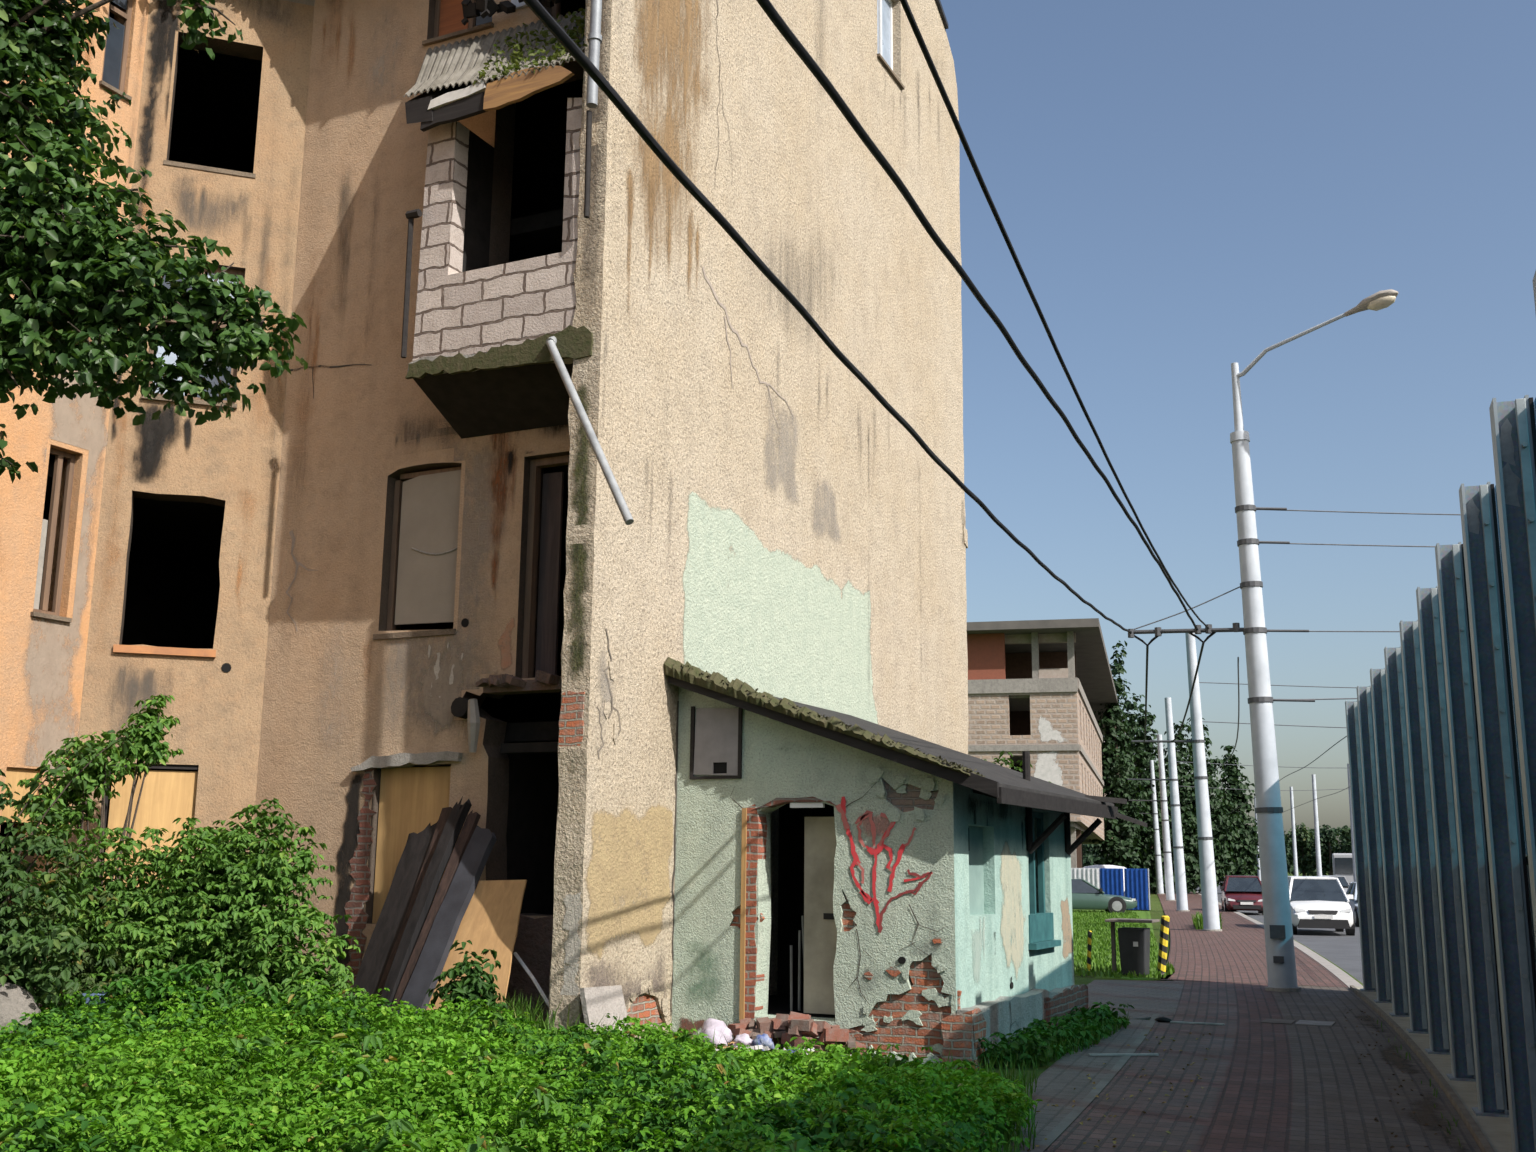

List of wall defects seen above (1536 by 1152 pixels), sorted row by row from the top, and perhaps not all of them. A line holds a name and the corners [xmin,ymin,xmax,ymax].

leakage [160,6,180,117]
leakage [628,0,707,284]
crack [702,266,794,435]
leakage [141,405,191,473]
flaking render [865,767,945,822]
flaking render [627,984,668,1036]
flaking render [730,906,741,928]
crack [849,904,946,1005]
flaking render [849,937,987,1069]